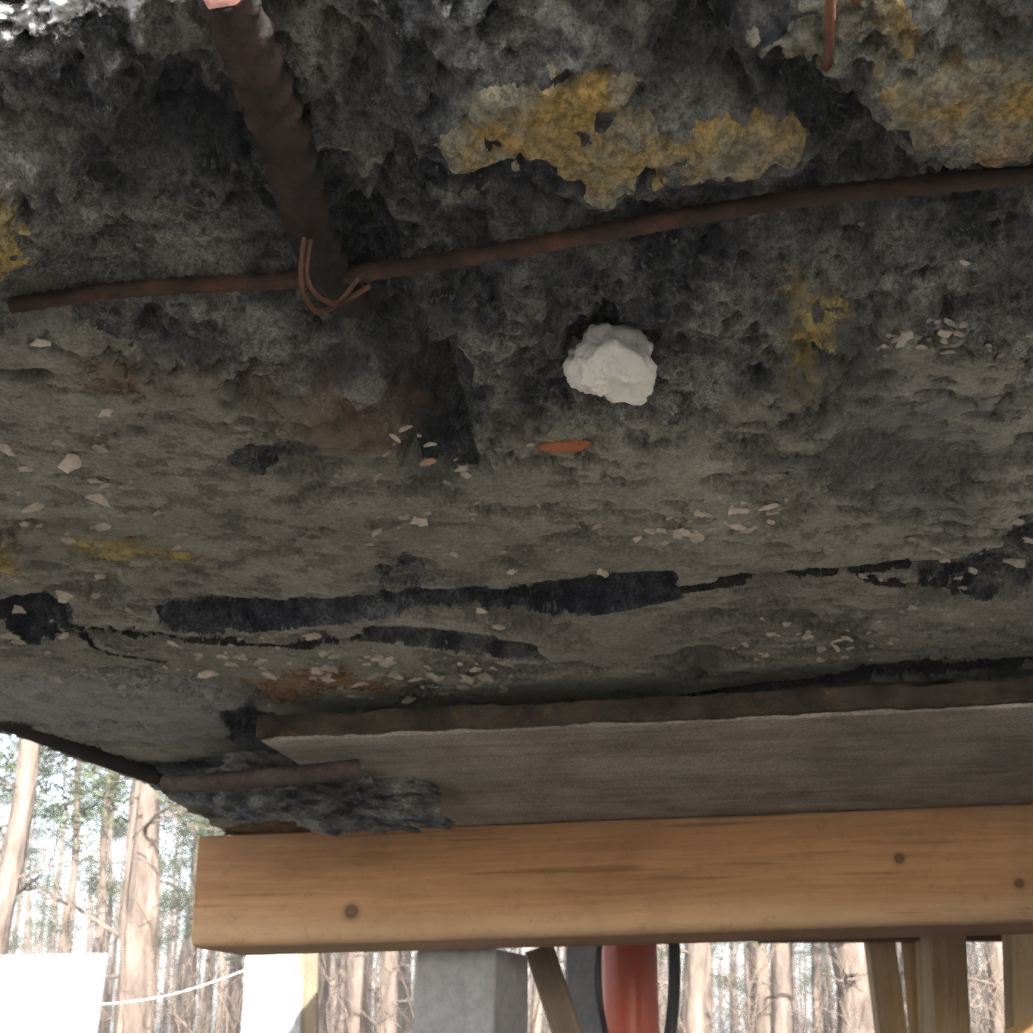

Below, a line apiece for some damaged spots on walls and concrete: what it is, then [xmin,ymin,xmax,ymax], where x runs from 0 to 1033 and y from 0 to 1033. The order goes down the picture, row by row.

spalling [0,0,1033,466]
peeling [0,444,34,472]
peeling [51,433,109,474]
peeling [227,440,321,476]
peeling [443,458,472,485]
peeling [19,501,45,528]
peeling [61,477,143,556]
peeling [397,511,431,530]
crack [677,558,952,593]
crack [0,595,16,618]
crack [48,598,362,663]